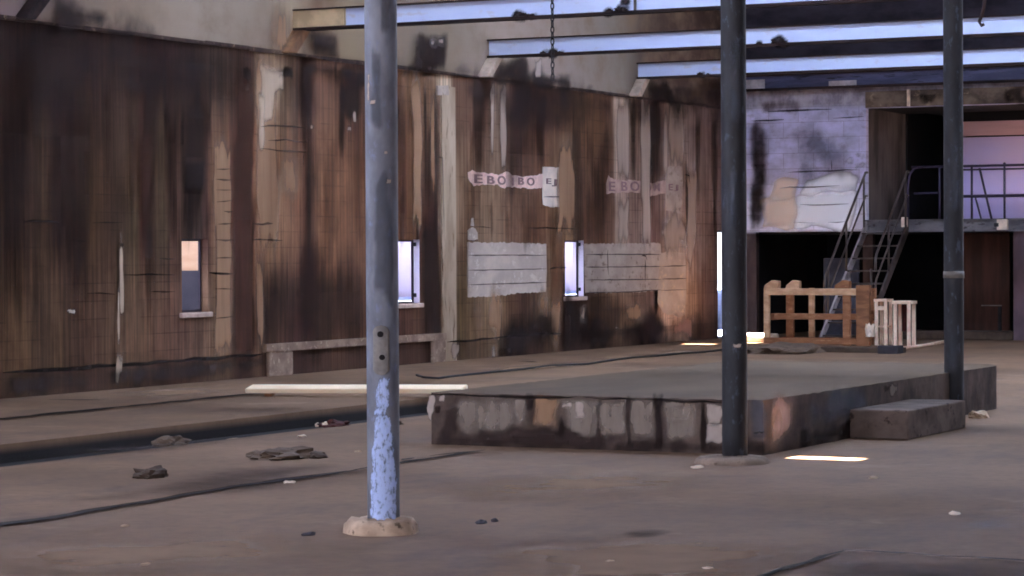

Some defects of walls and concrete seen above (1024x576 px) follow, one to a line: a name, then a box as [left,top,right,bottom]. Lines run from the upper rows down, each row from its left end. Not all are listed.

leakage [750,185,763,224]
peeling [772,172,857,199]
leakage [540,296,560,342]
peeling [370,378,397,521]